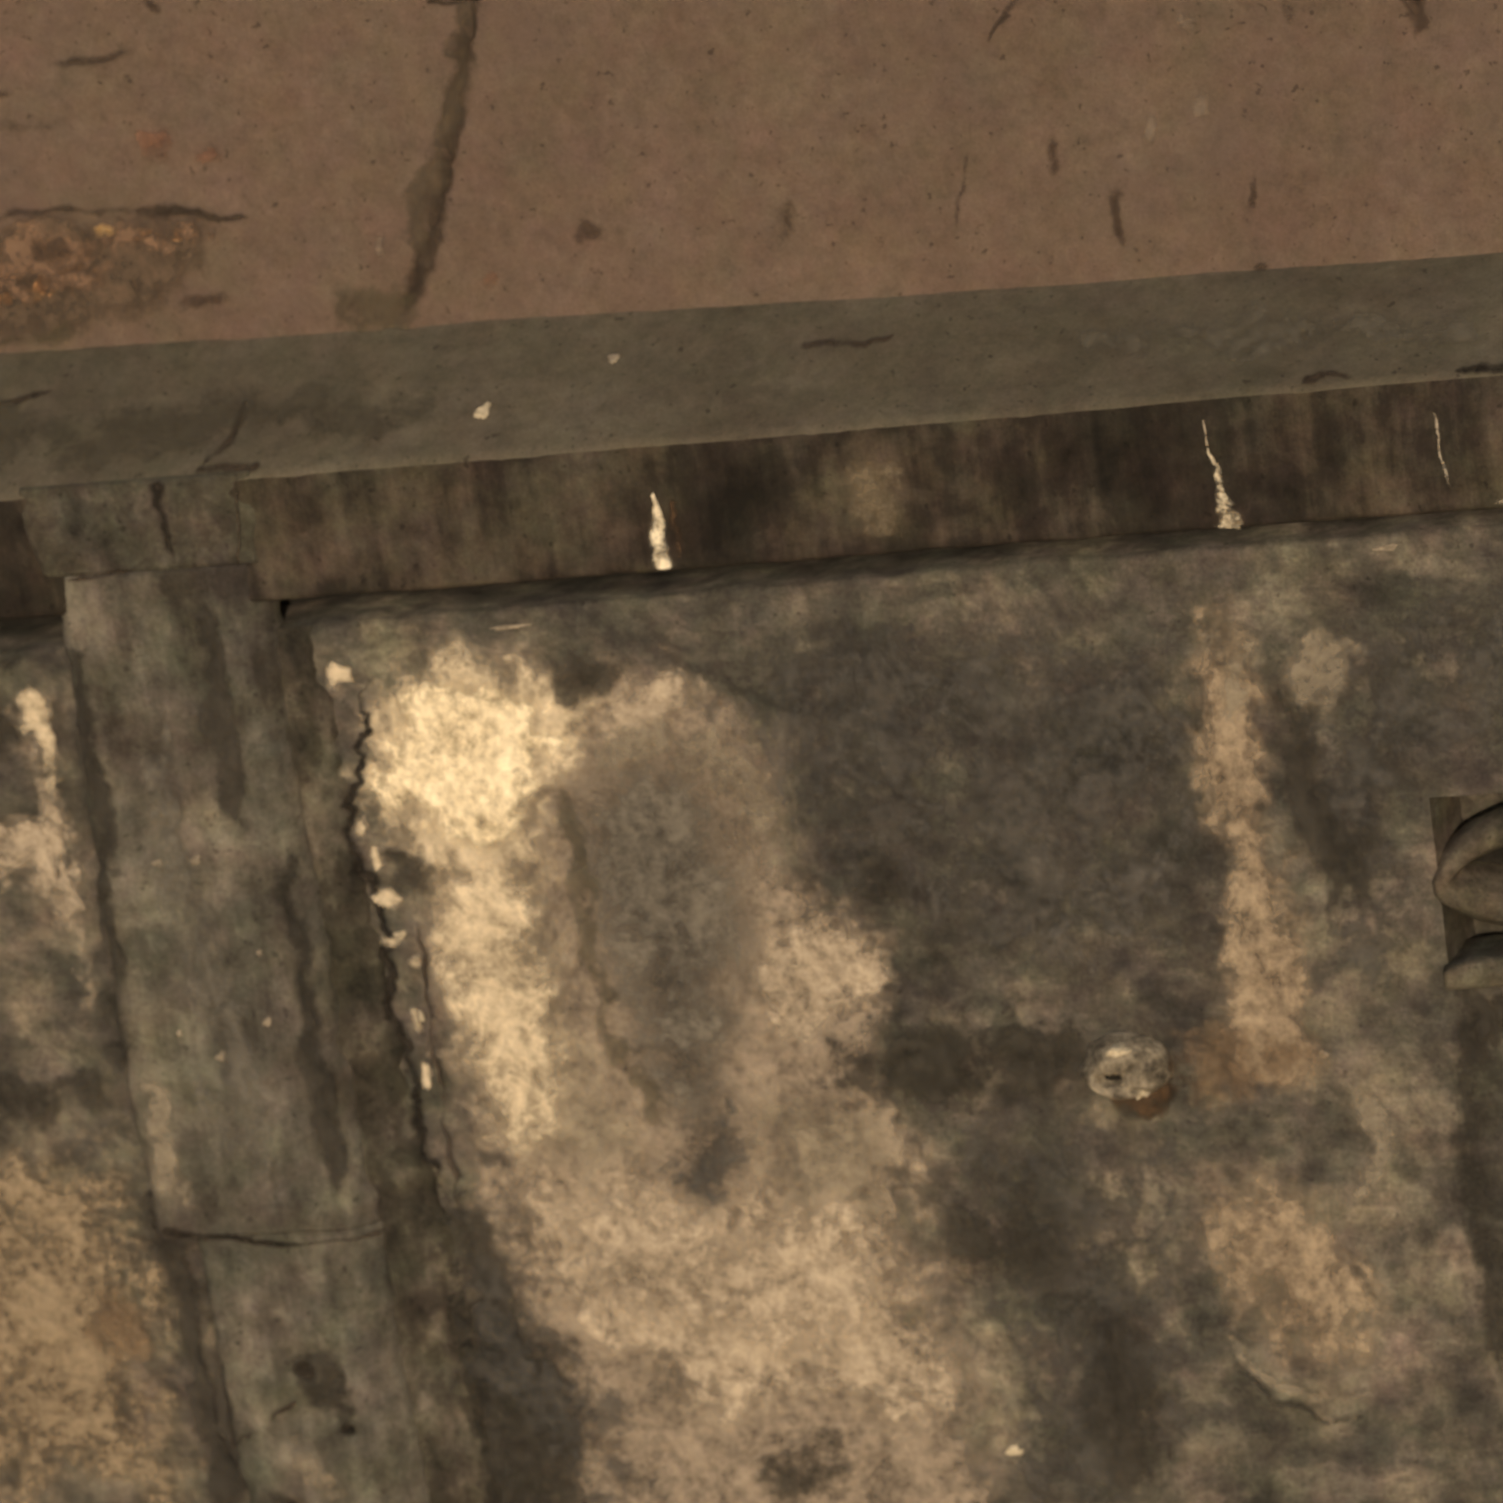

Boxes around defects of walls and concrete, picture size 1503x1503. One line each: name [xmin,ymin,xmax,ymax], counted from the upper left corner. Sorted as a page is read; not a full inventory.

crack [989,3,1013,39]
crack [1403,0,1428,32]
crack [403,0,477,308]
efflorescence [1203,421,1238,528]
efflorescence [651,493,671,569]
damp [65,648,126,982]
damp [425,596,1503,1503]